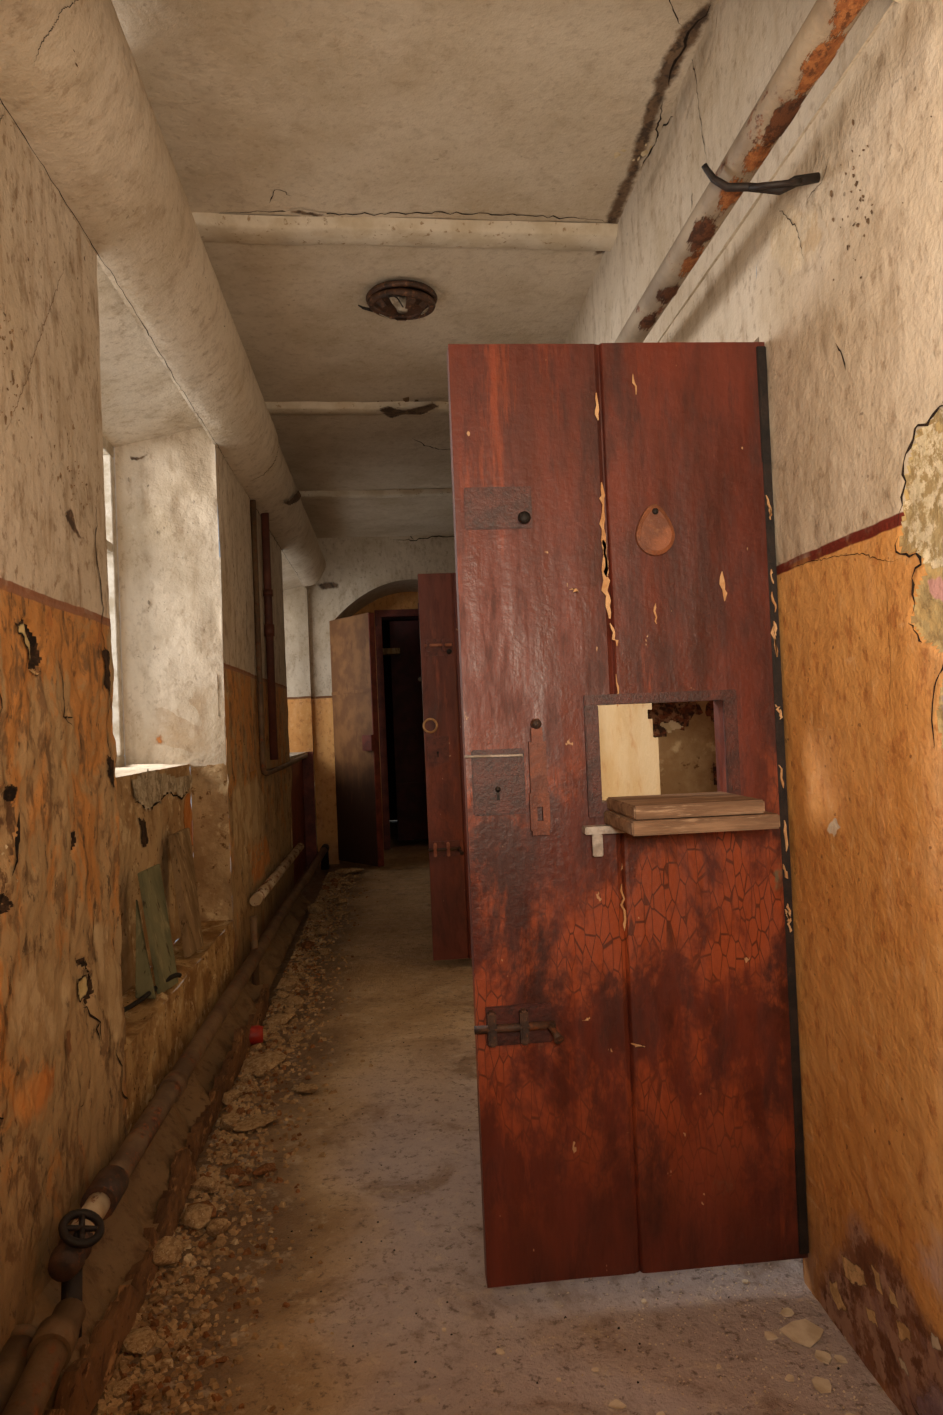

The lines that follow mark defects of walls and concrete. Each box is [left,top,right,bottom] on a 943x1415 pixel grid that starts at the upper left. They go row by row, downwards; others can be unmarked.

crack [36,0,78,57]
rust [638,0,869,331]
crack [0,99,301,580]
spalling [895,402,943,748]
damp [812,1196,943,1415]